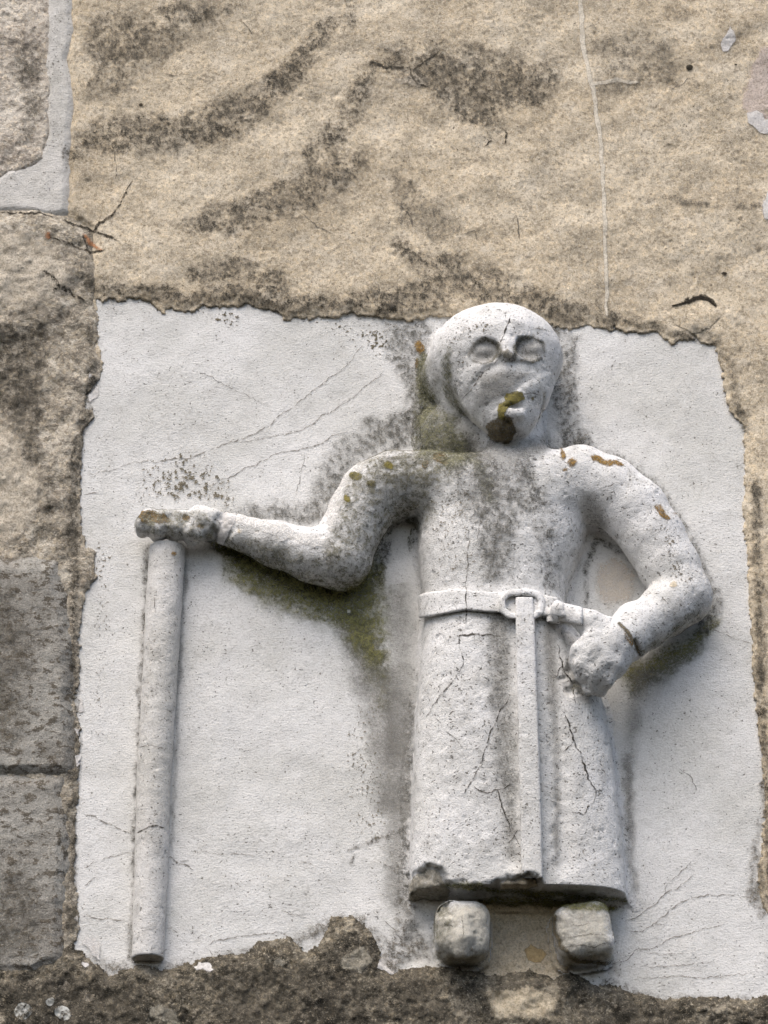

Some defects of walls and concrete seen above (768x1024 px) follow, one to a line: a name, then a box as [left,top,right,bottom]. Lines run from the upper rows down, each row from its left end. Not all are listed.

crack [84,349,382,495]
crack [427,486,519,844]
crack [554,644,601,815]
peeling [194,962,213,971]
spalling [341,947,398,975]
spalling [408,868,613,978]
crack [569,862,745,979]